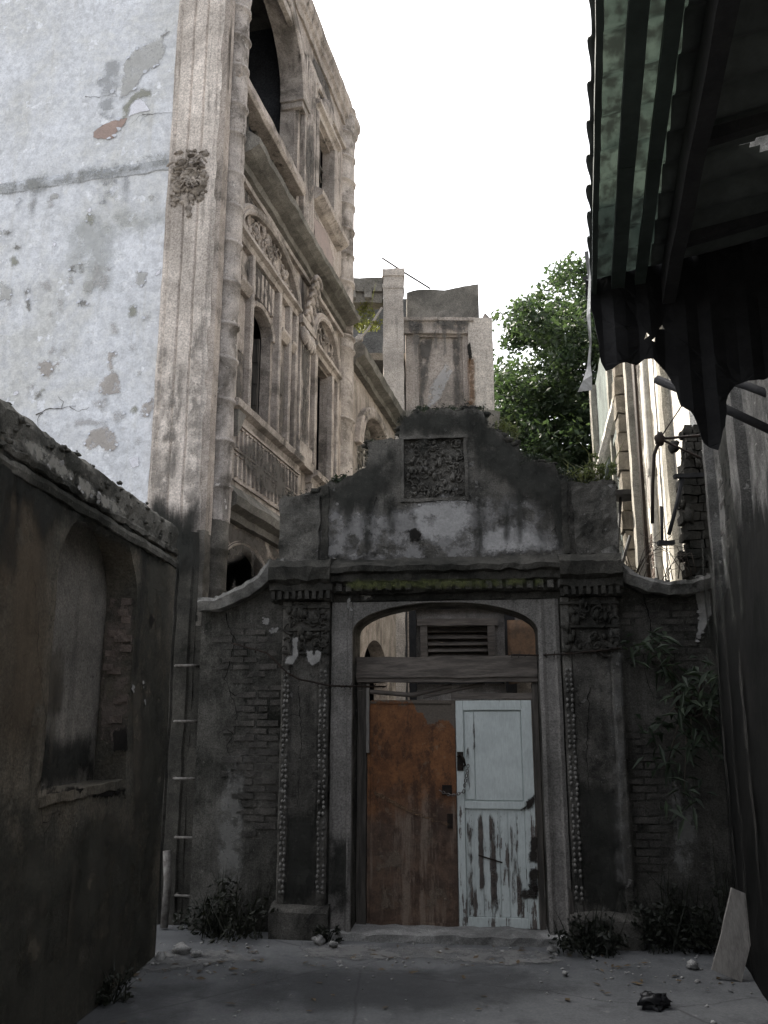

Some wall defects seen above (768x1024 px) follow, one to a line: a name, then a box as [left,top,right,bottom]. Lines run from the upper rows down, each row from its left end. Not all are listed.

peeling [93,31,169,139]
water stain [401,320,569,548]
water stain [335,451,393,527]
spalling [285,637,321,665]
peeling [467,815,498,915]
peeling [510,827,539,917]